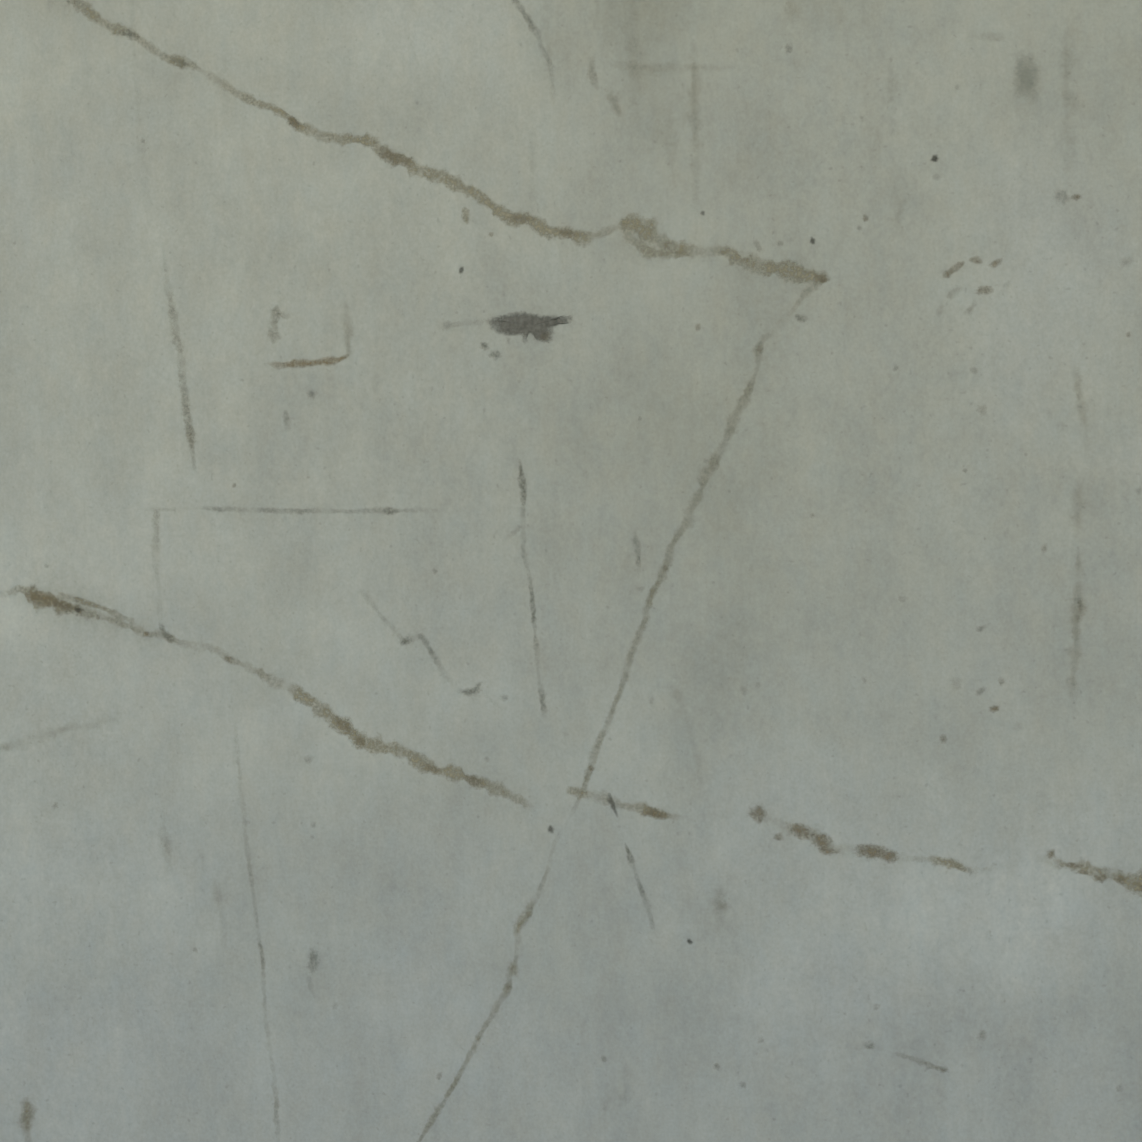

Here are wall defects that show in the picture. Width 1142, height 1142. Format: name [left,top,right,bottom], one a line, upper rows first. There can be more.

crack [74,1,139,38]
crack [170,57,184,68]
crack [243,95,588,242]
crack [622,217,687,255]
crack [720,248,826,282]
crack [25,587,106,613]
crack [294,688,505,793]
crack [643,804,667,818]
crack [793,825,831,853]
crack [860,846,895,860]
crack [1049,851,1142,891]